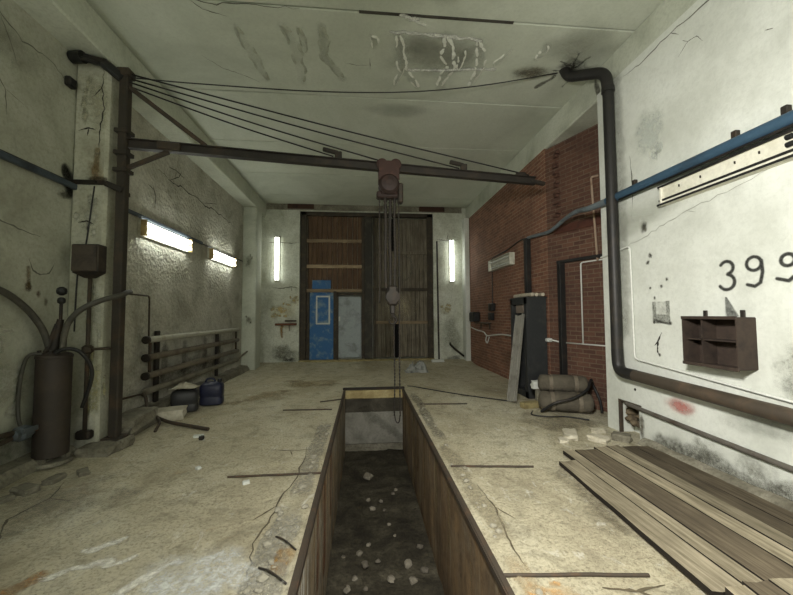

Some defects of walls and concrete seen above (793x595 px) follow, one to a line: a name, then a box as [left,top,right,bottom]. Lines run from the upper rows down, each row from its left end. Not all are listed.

crack [193,0,299,16]
peeling [393,35,420,88]
peeling [436,35,512,86]
leakage [519,57,589,88]
crack [149,167,230,223]
leakage [656,435,793,501]
crack [246,448,308,587]
crack [477,485,526,566]